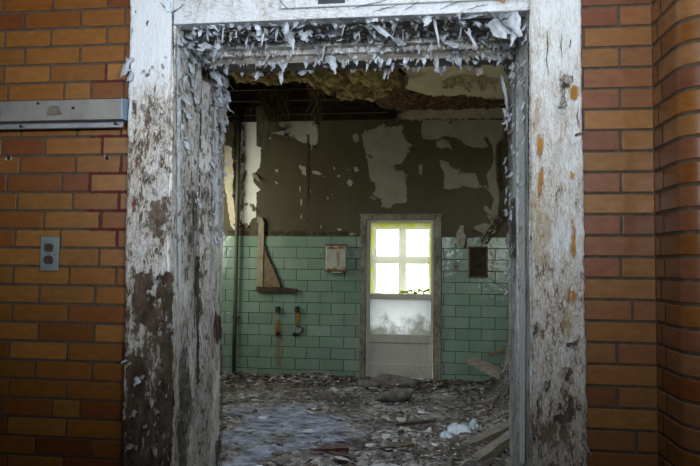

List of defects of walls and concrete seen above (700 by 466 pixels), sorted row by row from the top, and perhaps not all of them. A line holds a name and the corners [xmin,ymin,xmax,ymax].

peeling [120,9,540,466]